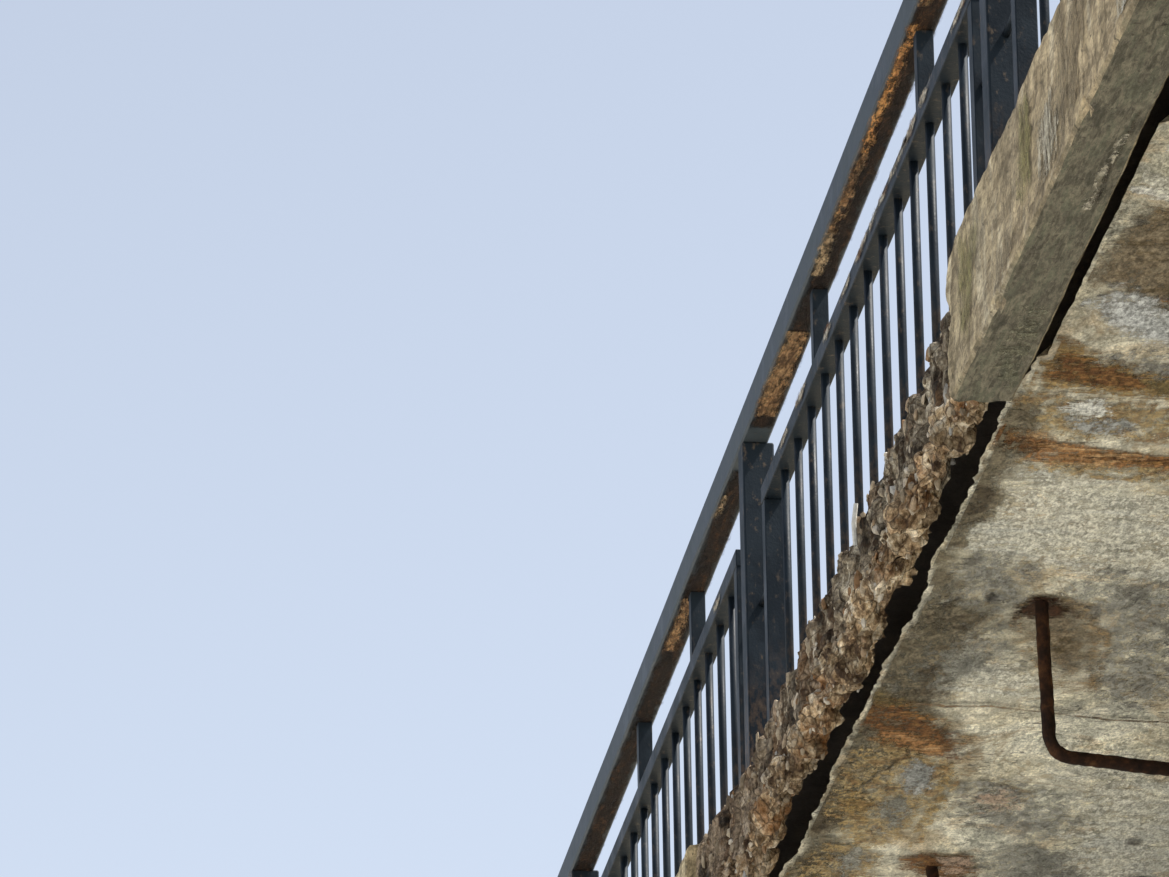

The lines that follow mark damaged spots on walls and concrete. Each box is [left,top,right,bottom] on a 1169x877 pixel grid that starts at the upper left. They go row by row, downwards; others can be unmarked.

leakage [1017,89,1058,204]
leakage [1081,134,1128,210]
leakage [1081,172,1169,382]
corrosion [1028,336,1169,402]
spalling [695,310,989,877]
leakage [783,392,1169,877]
corrosion [1010,597,1080,625]
crack [860,751,907,788]
corrosion [796,687,984,877]